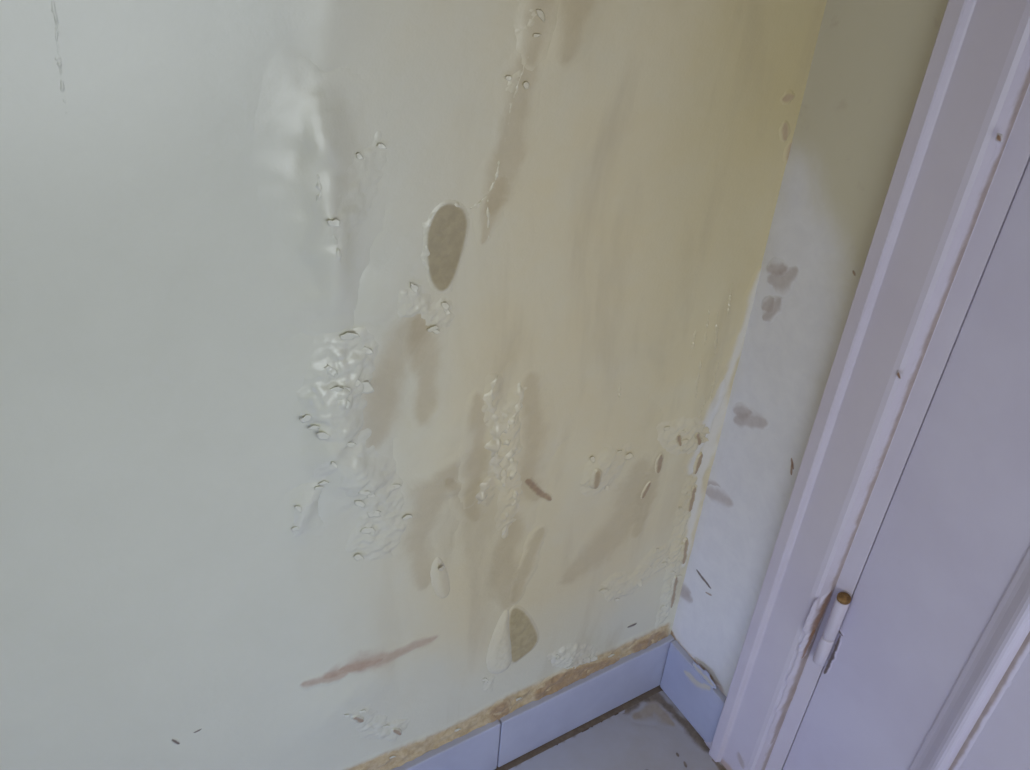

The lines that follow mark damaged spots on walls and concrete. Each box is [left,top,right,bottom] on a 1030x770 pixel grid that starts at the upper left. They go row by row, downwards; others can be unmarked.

damp [470,0,613,248]
peeling [420,199,470,294]
damp [340,309,492,596]
damp [476,365,558,615]
damp [554,114,872,697]
rust [297,631,441,691]
peeling [486,605,540,674]
spalling [337,618,726,770]
damp [767,624,820,745]